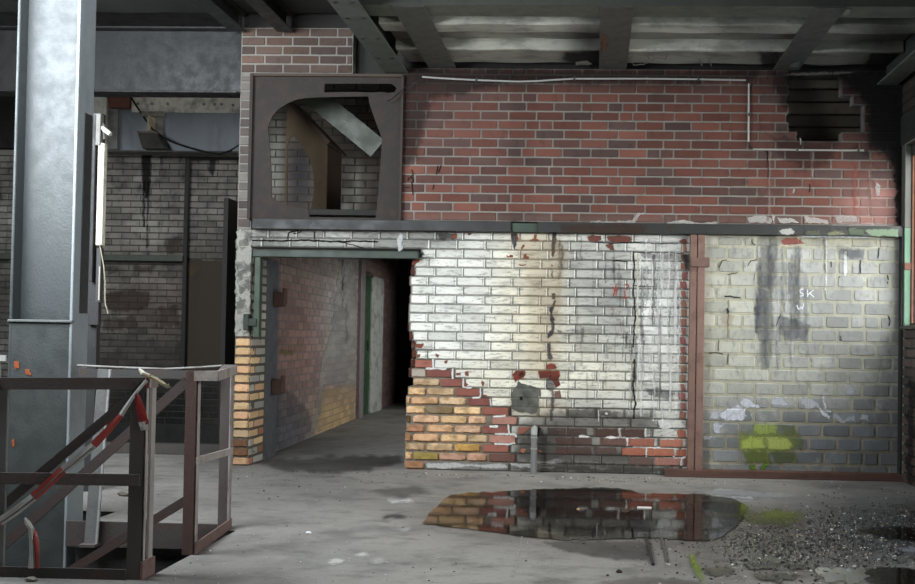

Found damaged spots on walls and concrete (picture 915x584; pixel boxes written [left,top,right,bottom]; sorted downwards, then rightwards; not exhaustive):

peeling [587,235,632,250]
spalling [404,238,687,471]
leakage [547,293,556,360]
crack [595,242,687,419]
leakage [625,254,681,429]
leakage [546,378,555,421]
leakage [606,428,661,457]